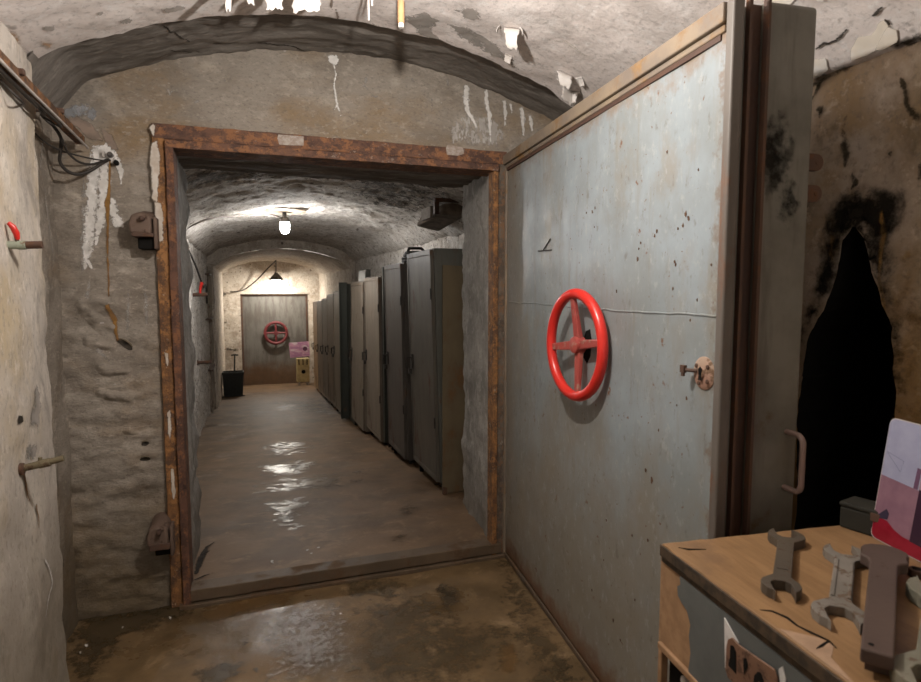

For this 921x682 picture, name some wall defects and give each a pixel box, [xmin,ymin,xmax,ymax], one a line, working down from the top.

peeling [850,21,898,60]
leakage [895,34,921,47]
leakage [328,55,341,116]
leakage [451,85,533,148]
peeling [556,70,585,106]
peeling [813,58,828,78]
leakage [812,66,852,117]
leakage [900,78,920,120]
leakage [841,130,858,190]
leakage [81,144,124,271]
rust [104,161,119,341]